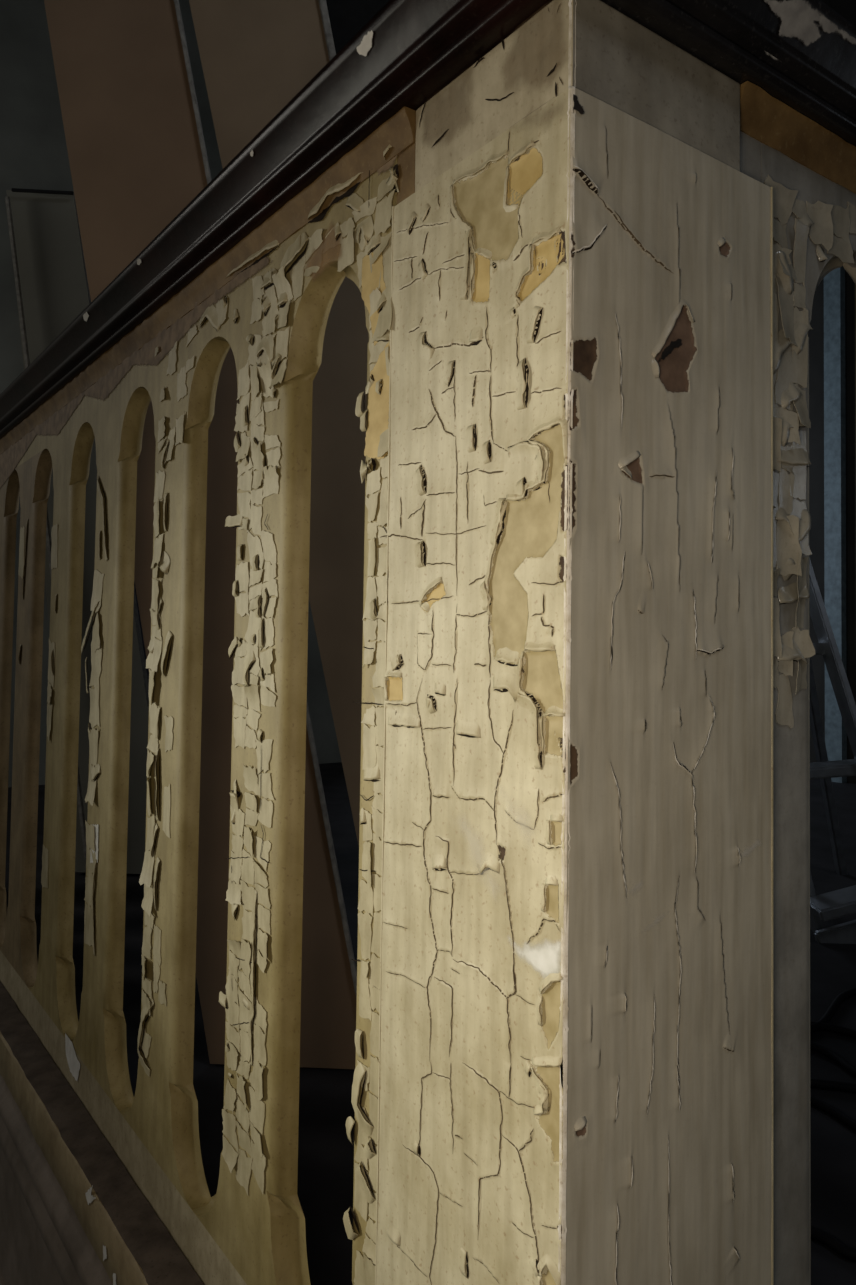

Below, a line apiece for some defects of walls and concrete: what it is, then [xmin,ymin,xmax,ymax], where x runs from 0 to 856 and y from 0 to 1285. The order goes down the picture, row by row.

crack [419,100,448,147]
peeling [450,140,565,304]
crack [547,63,563,97]
crack [572,126,680,274]
peeling [651,299,697,393]
peeling [765,175,856,728]
peeling [419,577,446,612]
peeling [485,416,568,756]
peeling [0,145,403,1285]
crack [380,195,564,1285]
crack [591,387,735,1123]
peeling [530,972,587,1162]